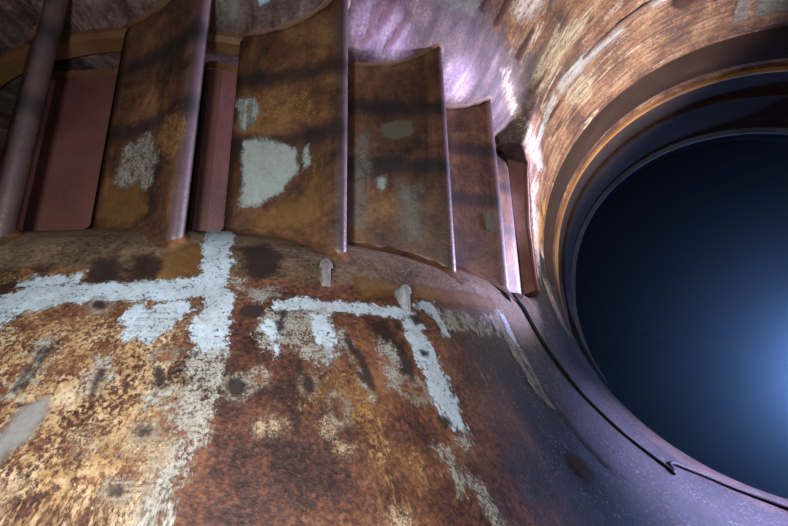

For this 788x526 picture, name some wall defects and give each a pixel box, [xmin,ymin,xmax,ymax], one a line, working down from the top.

rust [362,0,397,44]
rust [516,24,536,60]
rust [673,0,697,10]
rust [732,0,751,23]
peeling [236,97,261,130]
peeling [114,131,160,190]
peeling [239,138,311,208]
rust [125,244,205,282]
rust [410,286,497,310]
peeling [0,231,557,526]
rust [0,300,188,526]
rust [299,319,414,526]